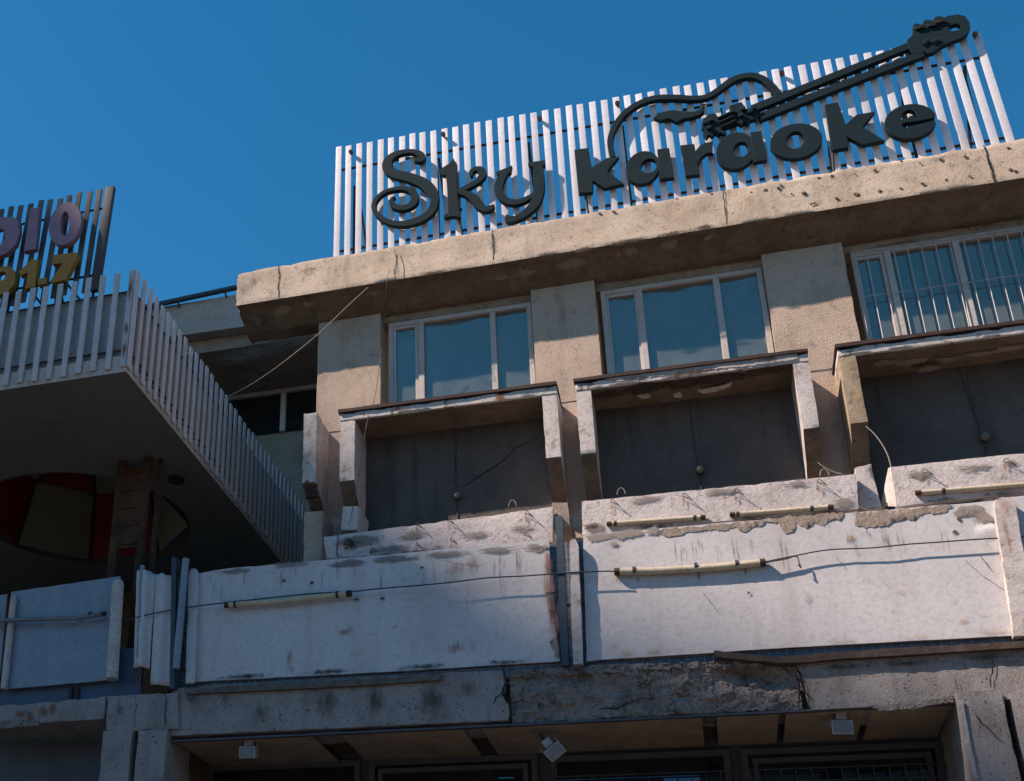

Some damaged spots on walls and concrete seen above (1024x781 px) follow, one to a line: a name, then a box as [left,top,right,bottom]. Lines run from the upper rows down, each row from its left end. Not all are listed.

spalling [593,353,798,399]
peeling [582,498,994,546]
crack [493,668,526,726]
spalling [510,635,803,723]
crack [795,664,811,708]